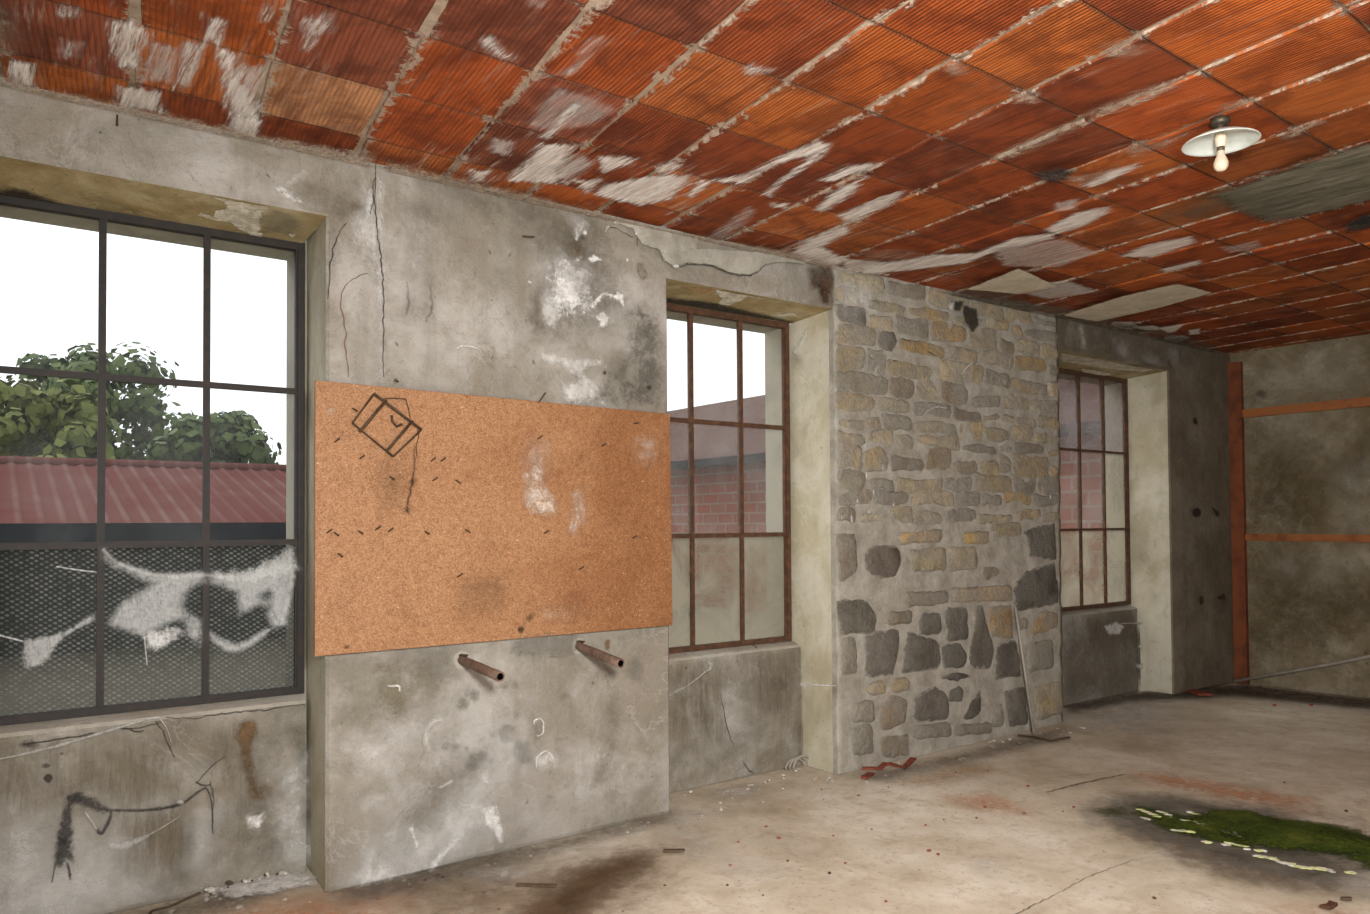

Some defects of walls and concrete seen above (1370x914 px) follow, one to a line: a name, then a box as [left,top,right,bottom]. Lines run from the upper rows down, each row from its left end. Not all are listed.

peeling [199,197,269,237]
water stain [1344,214,1370,231]
crack [328,165,409,378]
corrosion [237,722,259,799]
water stain [1099,795,1368,886]
crack [1016,861,1129,914]